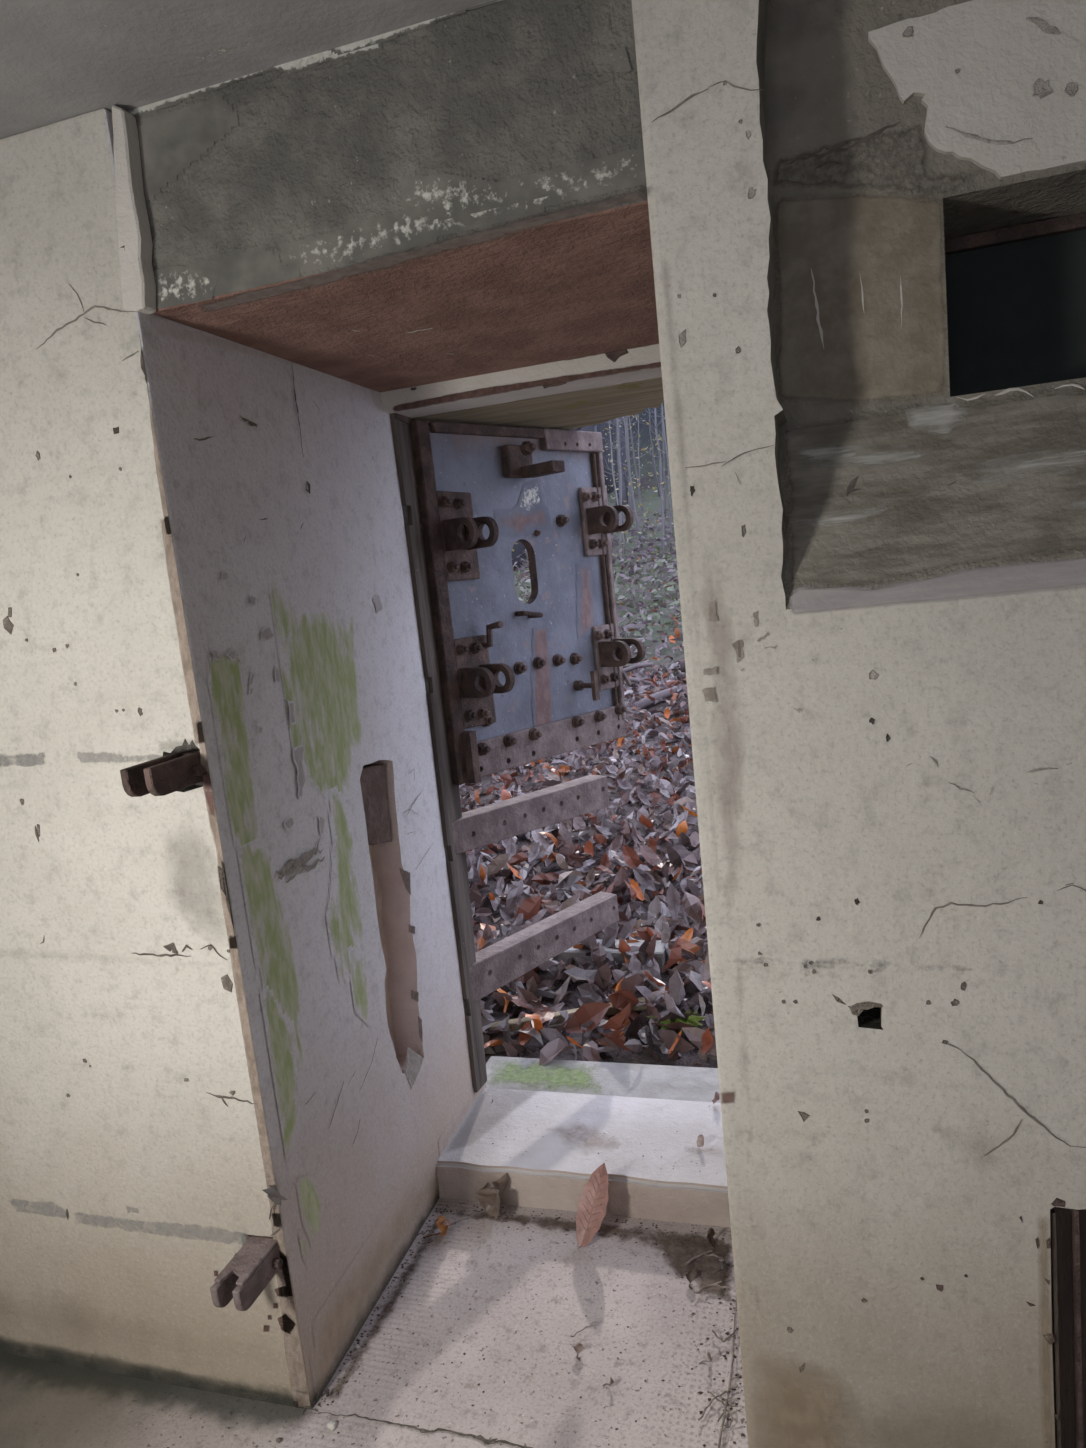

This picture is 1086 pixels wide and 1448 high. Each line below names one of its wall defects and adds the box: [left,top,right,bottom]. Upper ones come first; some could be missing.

spalling [1032,78,1078,99]
leakage [280,147,646,273]
leakage [154,265,219,308]
crack [37,284,151,406]
corrosion [530,625,555,727]
spalling [400,869,411,895]
crack [919,883,1086,938]
spalling [832,994,883,1016]
spalling [405,990,423,1089]
crack [946,1043,1086,1156]
crack [302,1408,533,1448]